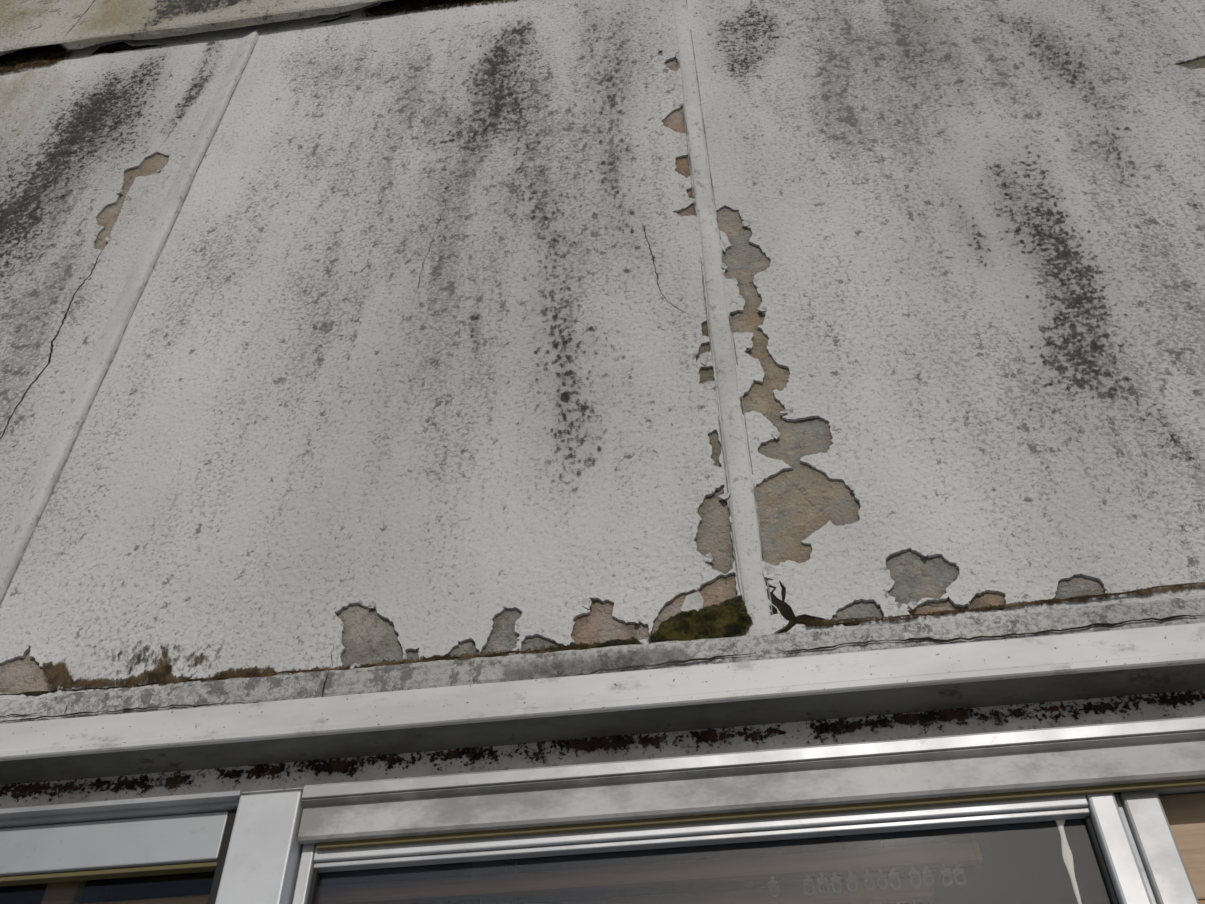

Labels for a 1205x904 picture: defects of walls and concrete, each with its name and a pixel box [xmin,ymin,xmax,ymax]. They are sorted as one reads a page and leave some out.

crack [0,256,99,439]
leakage [0,40,226,287]
peeling [95,154,169,250]
mould [418,17,625,492]
mould [565,8,658,274]
peeling [676,156,696,216]
peeling [696,322,714,383]
peeling [717,207,860,579]
leakage [956,124,1194,460]
peeling [336,602,419,669]
peeling [449,487,737,660]
peeling [886,550,1006,618]